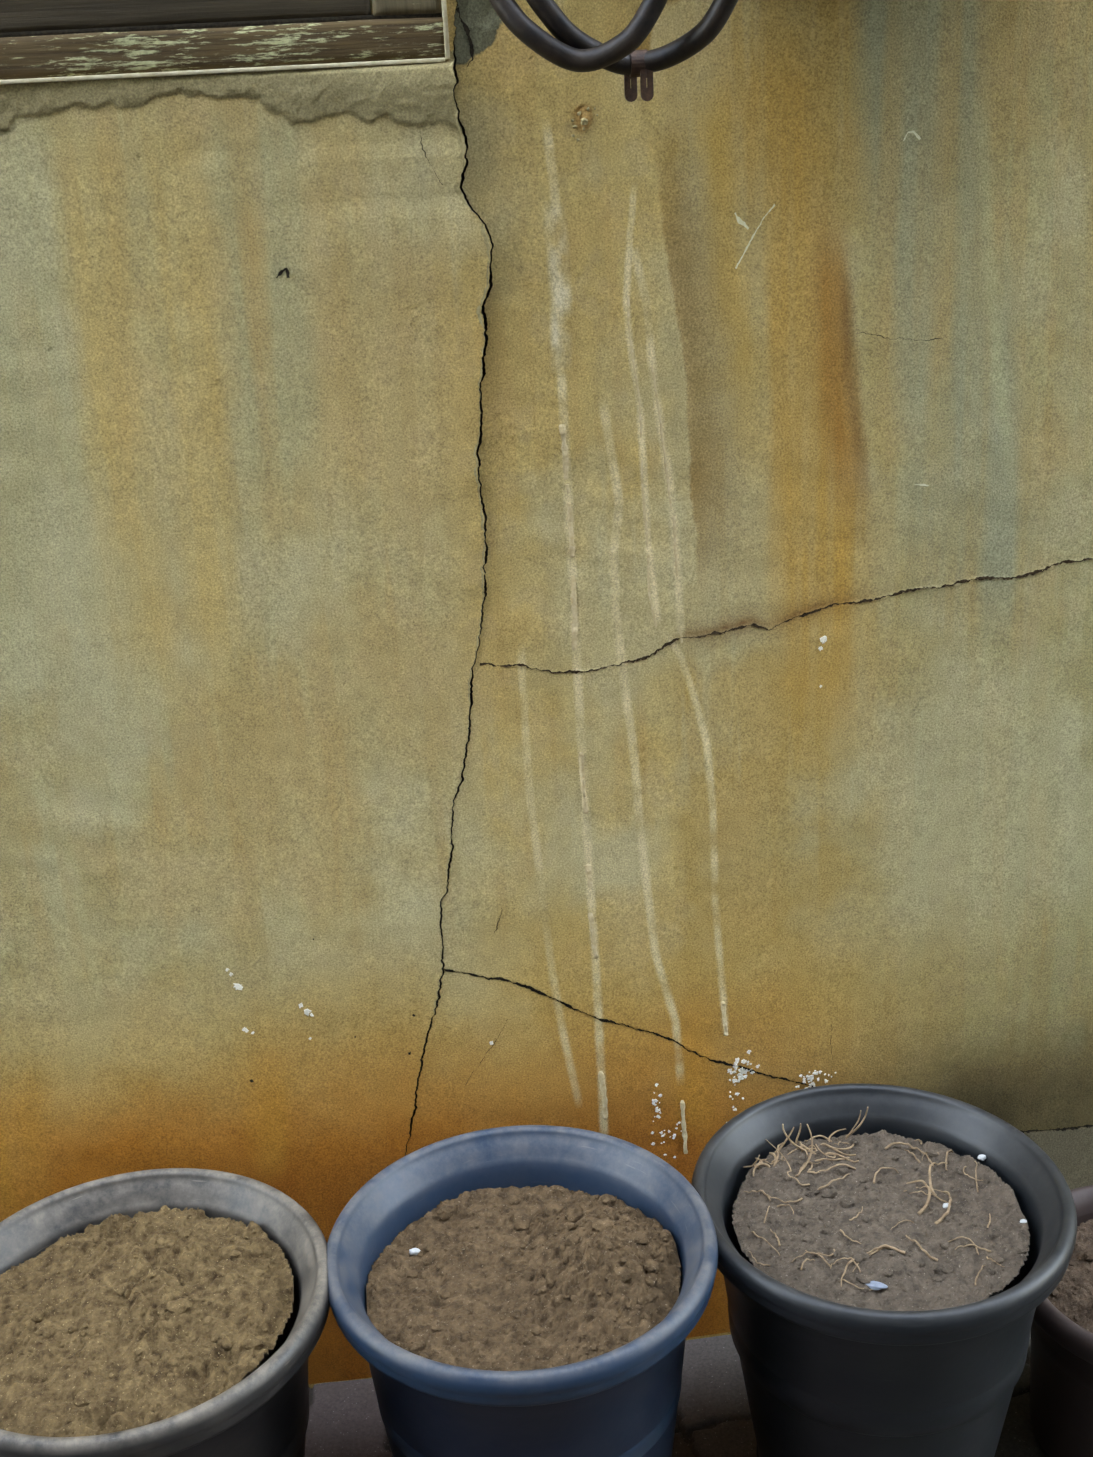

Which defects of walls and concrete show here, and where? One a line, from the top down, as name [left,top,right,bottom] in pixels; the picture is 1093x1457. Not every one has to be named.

corrosion [671,15,903,780]
water stain [514,118,611,1135]
water stain [596,121,760,1154]
crack [405,1,1093,1156]
corrosion [0,966,943,1242]
water stain [717,993,1093,1190]
corrosion [308,1306,372,1384]
corrosion [686,1268,723,1338]
water stain [720,1274,731,1333]